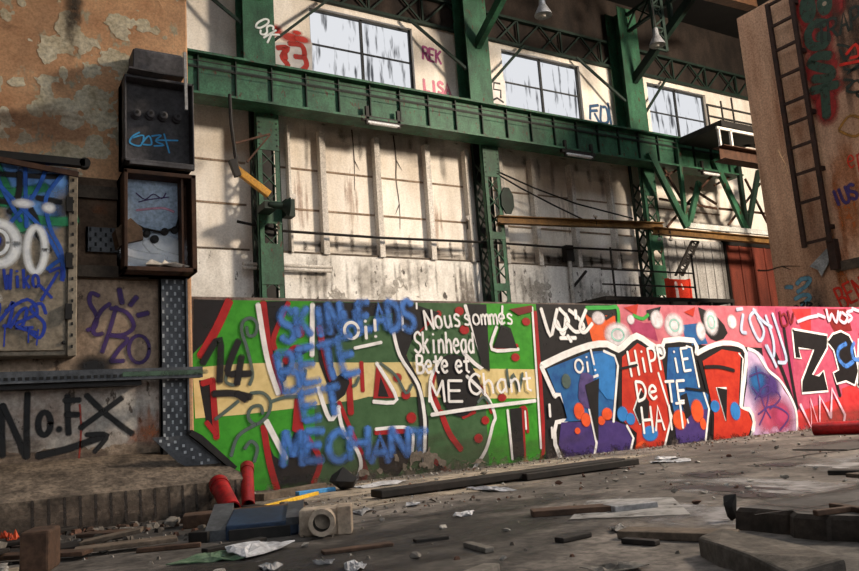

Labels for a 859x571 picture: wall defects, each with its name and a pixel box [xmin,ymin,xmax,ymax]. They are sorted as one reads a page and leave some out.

leakage [67,0,82,36]
peeling [104,10,167,41]
peeling [0,0,130,175]
leakage [455,271,479,302]